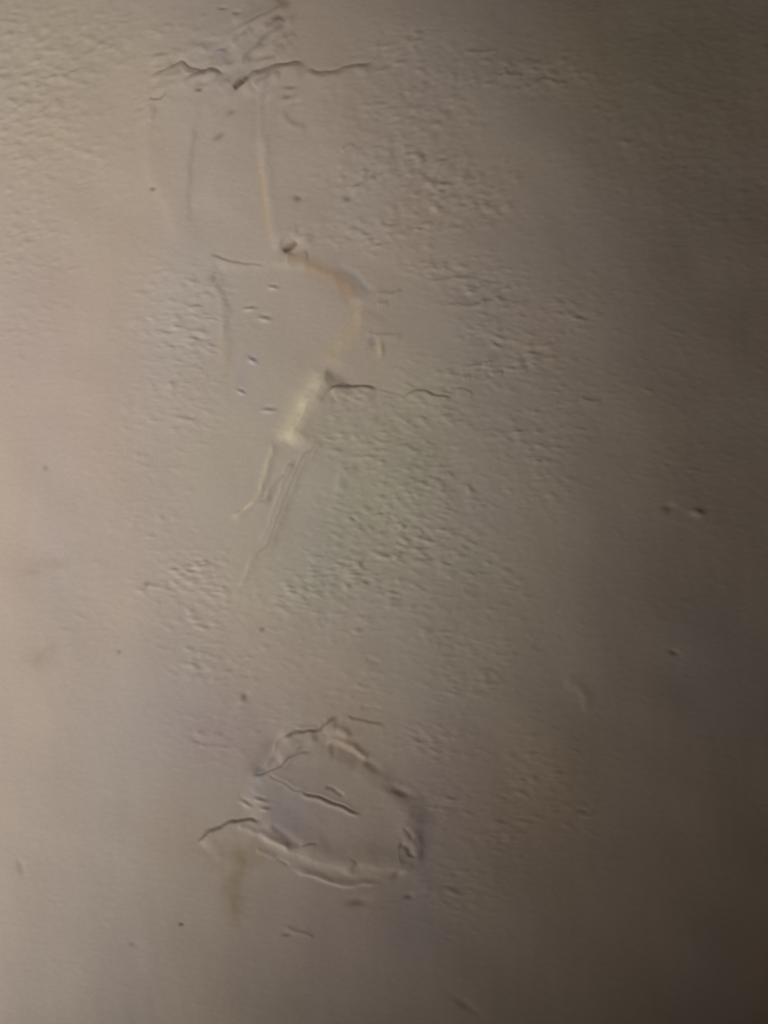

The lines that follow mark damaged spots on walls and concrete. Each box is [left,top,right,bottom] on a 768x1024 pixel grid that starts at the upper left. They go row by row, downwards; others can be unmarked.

crack [139,0,384,103]